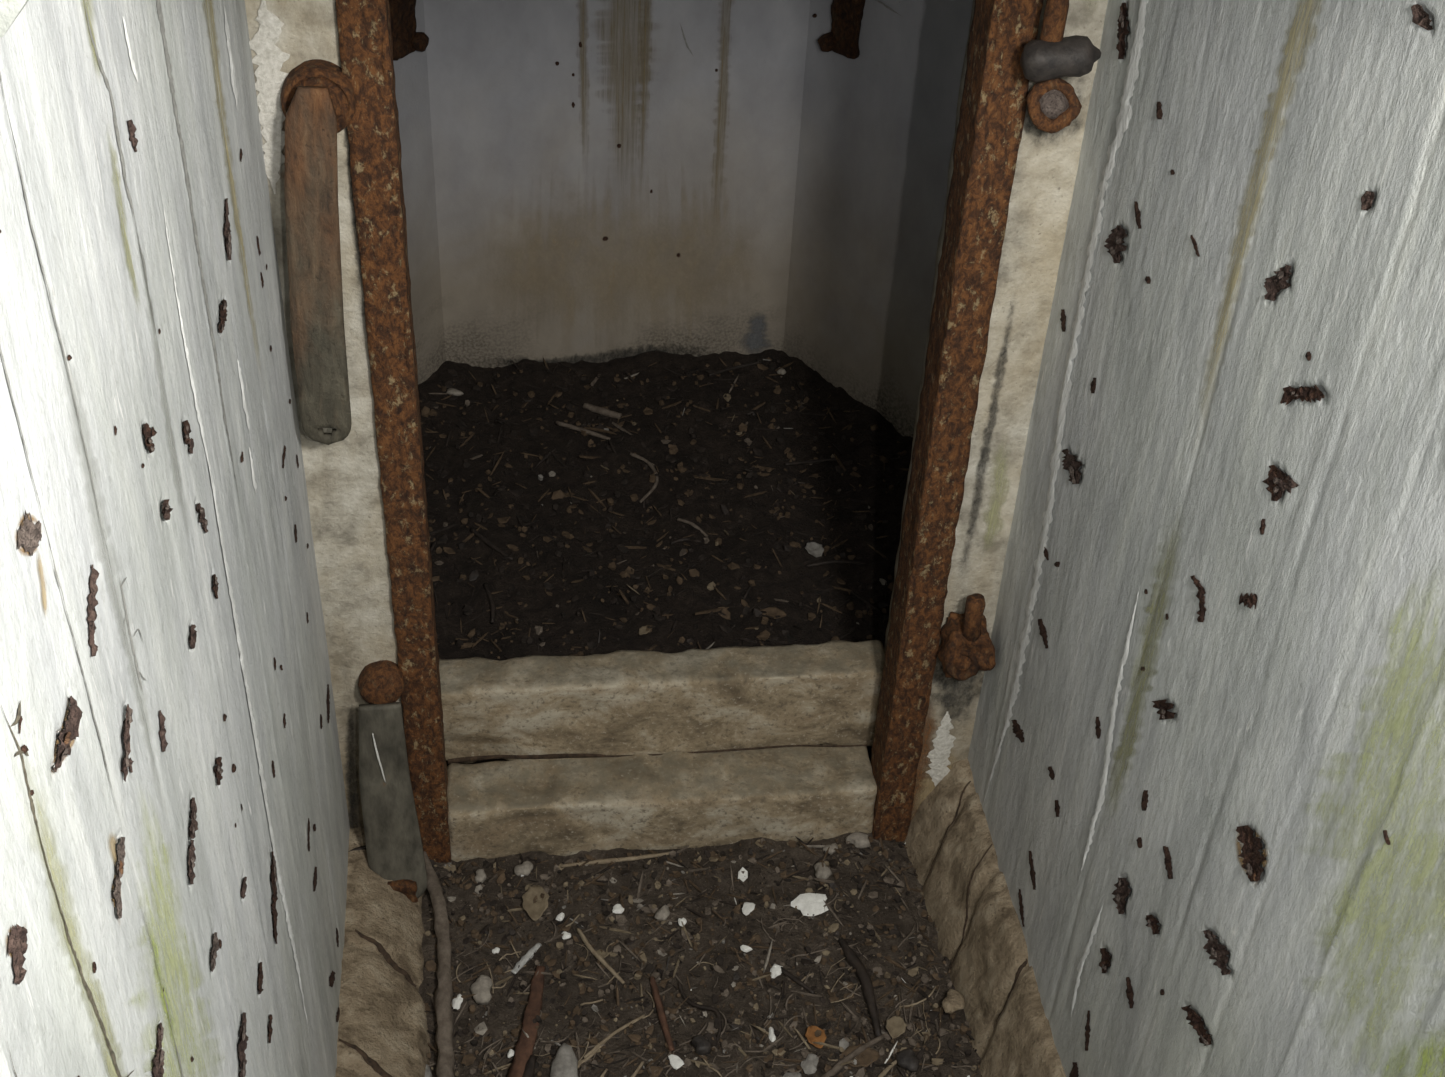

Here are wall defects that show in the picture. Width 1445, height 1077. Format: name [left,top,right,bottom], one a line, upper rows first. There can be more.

corrosion [39,560,47,611]
corrosion [1038,619,1048,649]
corrosion [320,684,330,729]
corrosion [1011,720,1024,743]
corrosion [912,715,935,818]
corrosion [1163,846,1173,879]
corrosion [1018,851,1036,927]
corrosion [1126,977,1134,1008]
corrosion [1069,1010,1091,1077]